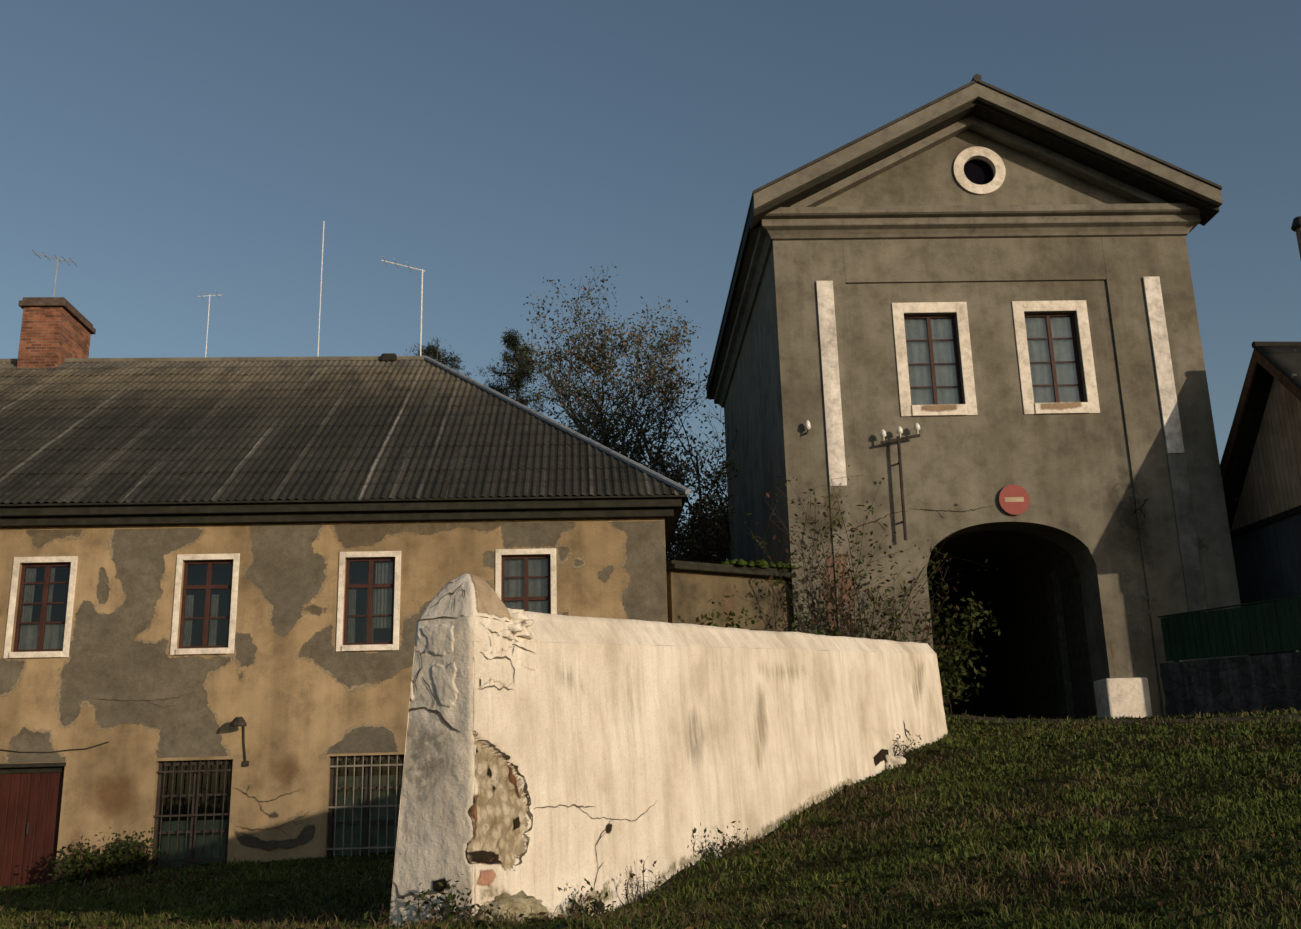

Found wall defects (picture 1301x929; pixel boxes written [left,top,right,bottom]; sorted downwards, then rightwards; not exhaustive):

flaking render [0,658,26,697]
flaking render [4,528,258,763]
flaking render [320,723,398,758]
flaking render [244,521,667,708]
crack [409,577,535,733]
flaking render [466,731,551,923]
crack [536,804,655,888]